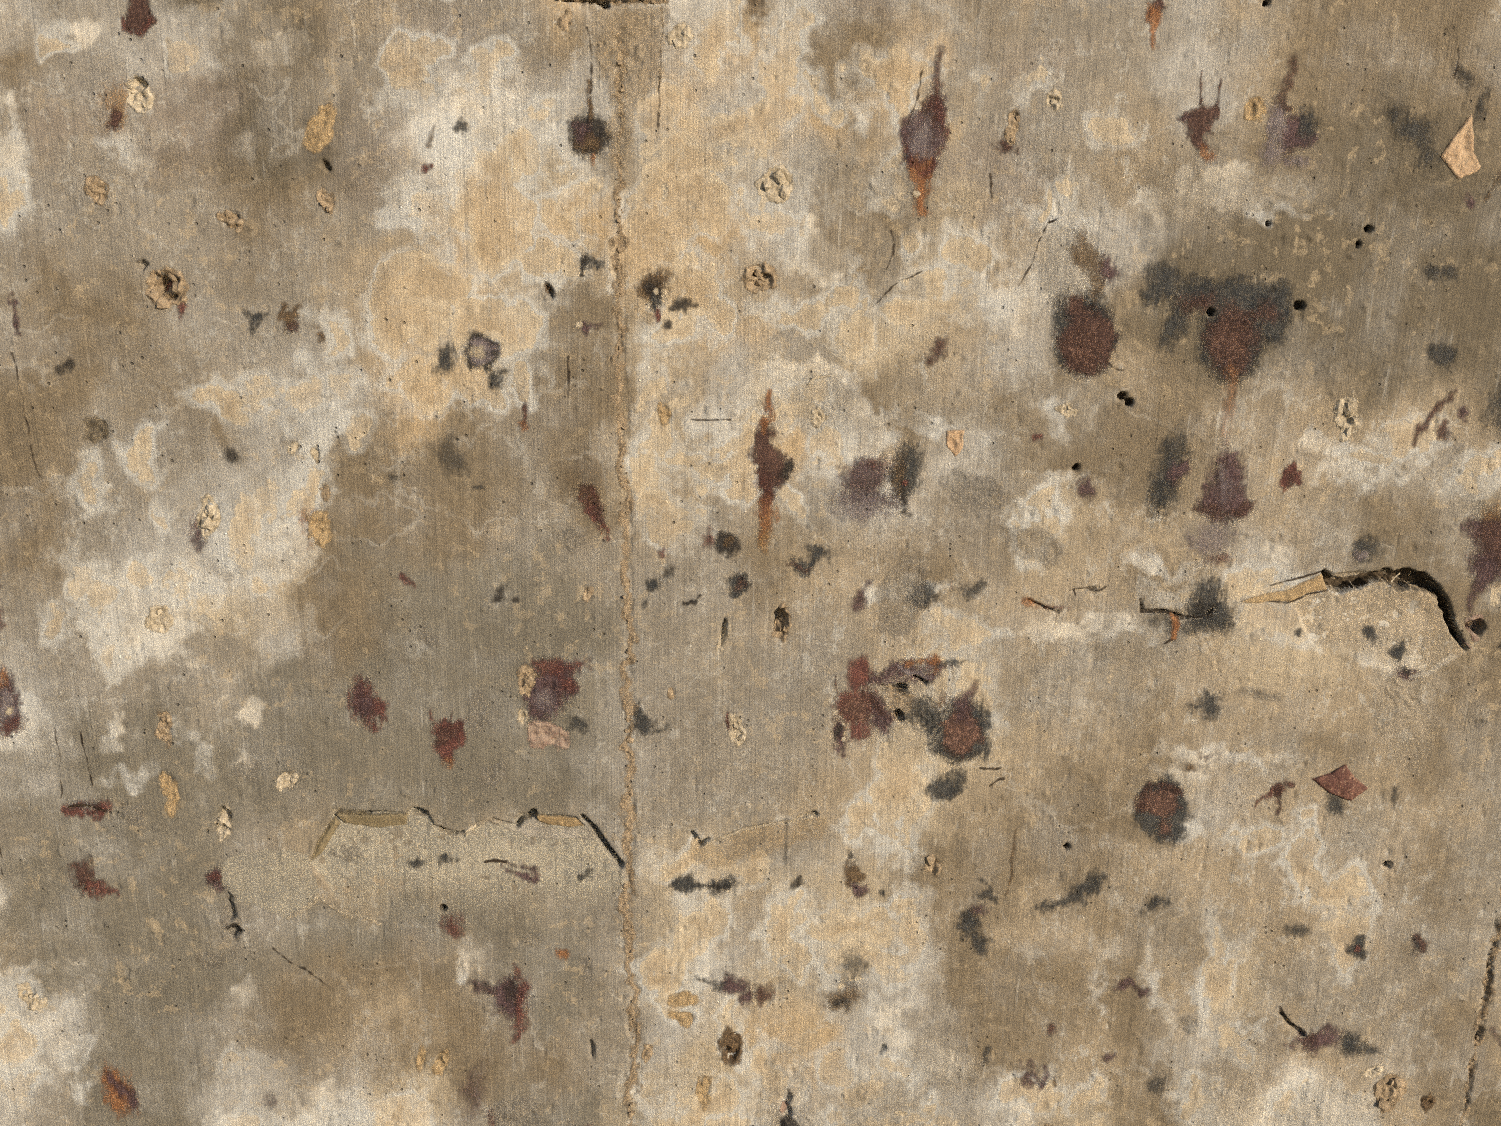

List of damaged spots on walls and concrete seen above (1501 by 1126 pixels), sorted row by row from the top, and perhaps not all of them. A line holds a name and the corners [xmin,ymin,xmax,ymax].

corrosion [900,49,949,216]
corrosion [1178,74,1222,160]
spalling [1441,115,1481,179]
spalling [145,267,189,316]
corrosion [749,390,794,539]
corrosion [1461,515,1501,610]
corrosion [523,659,588,732]
corrosion [835,655,963,740]